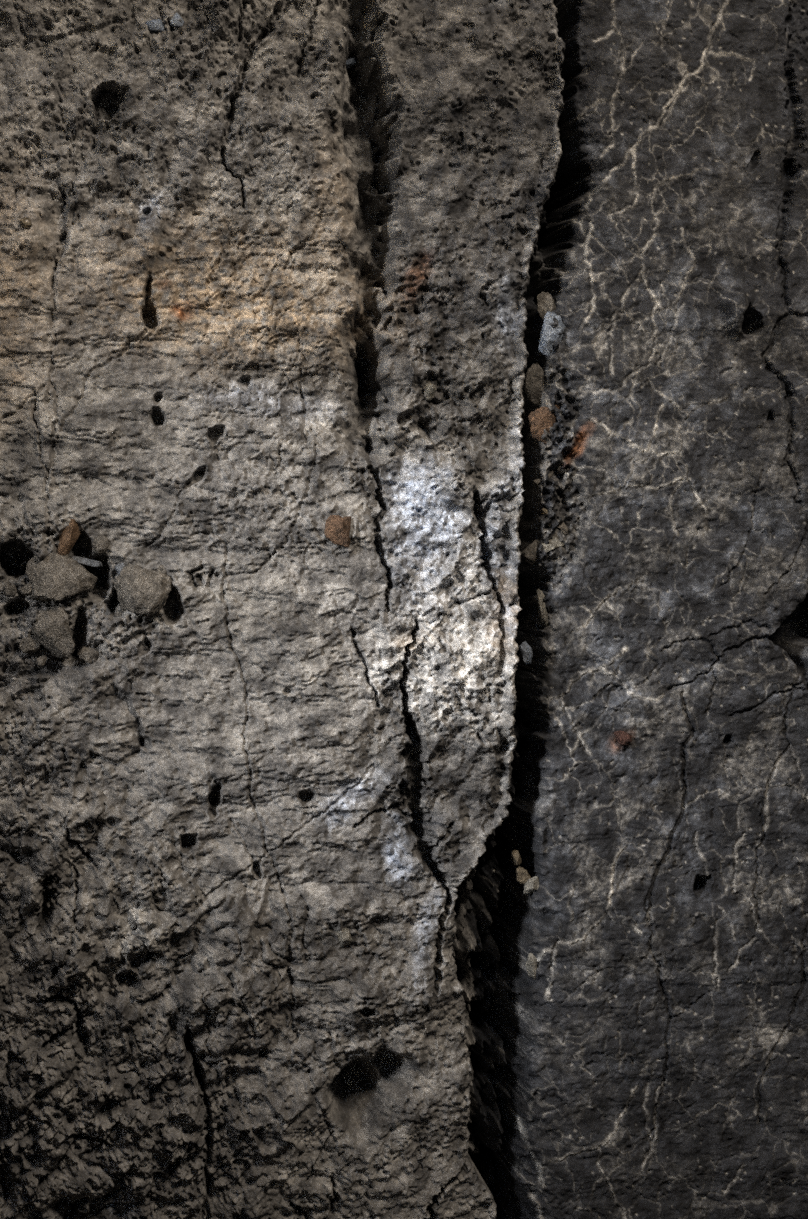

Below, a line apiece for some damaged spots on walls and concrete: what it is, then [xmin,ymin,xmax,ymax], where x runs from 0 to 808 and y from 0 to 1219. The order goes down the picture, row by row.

crack [140,332,494,1189]
crack [424,1156,473,1219]
crack [501,0,808,1219]